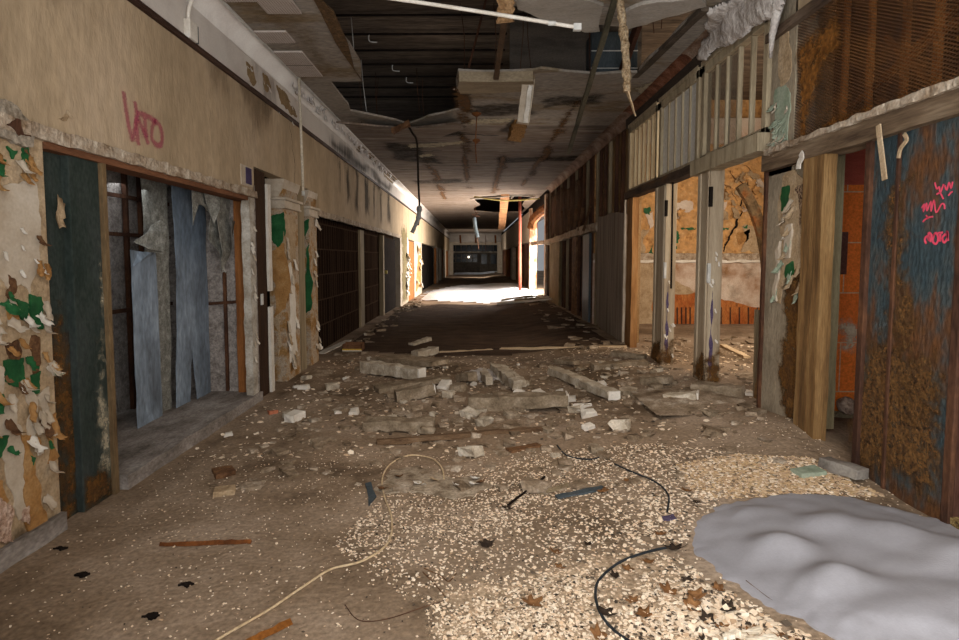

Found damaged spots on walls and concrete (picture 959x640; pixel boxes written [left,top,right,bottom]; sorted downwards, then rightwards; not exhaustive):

spalling [458,71,535,123]
spalling [832,0,959,122]
peeling [677,200,693,219]
peeling [723,163,764,253]
peeling [770,170,803,304]
peeling [0,99,68,543]
peeling [32,212,908,640]